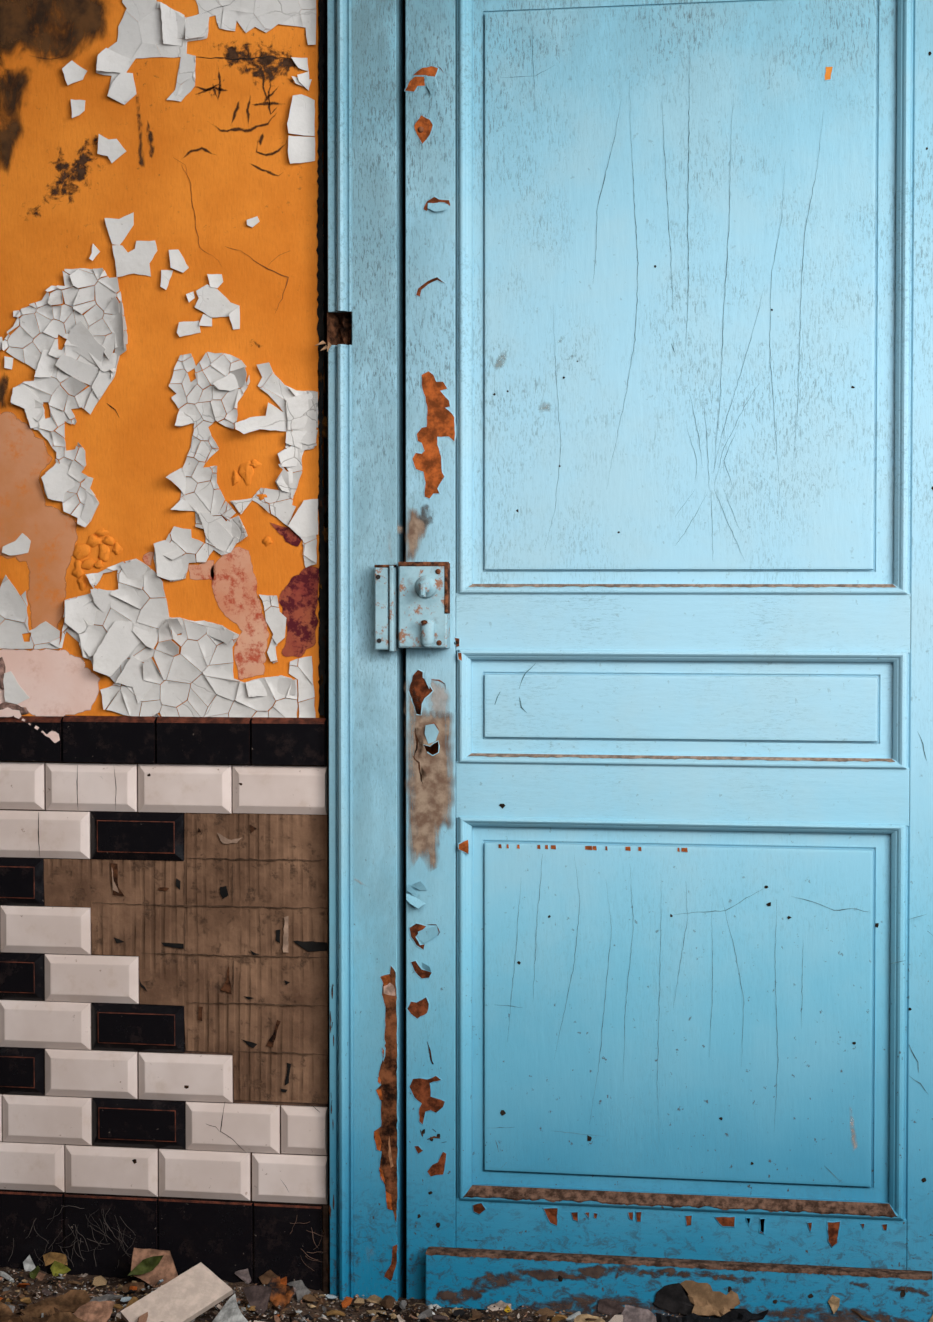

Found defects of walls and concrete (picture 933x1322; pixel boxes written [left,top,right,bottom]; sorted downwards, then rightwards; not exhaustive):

leakage [0,0,106,169]
peeling [0,212,320,743]
peeling [62,0,316,164]
peeling [411,370,456,500]
crack [593,80,638,486]
crack [662,45,690,353]
crack [677,110,824,552]
peeling [408,669,434,716]
peeling [44,813,328,1104]
peeling [373,922,448,1223]
crack [500,854,543,1041]
crack [554,857,868,1137]